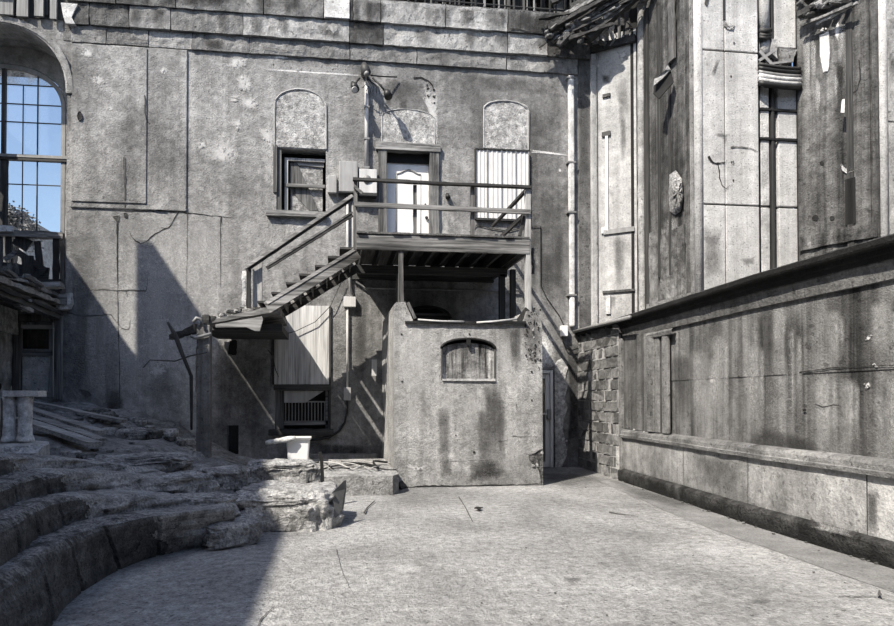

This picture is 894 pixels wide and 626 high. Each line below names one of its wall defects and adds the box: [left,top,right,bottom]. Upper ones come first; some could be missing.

crack [67,157,233,401]
peeling [554,358,568,467]
damp [474,462,501,478]